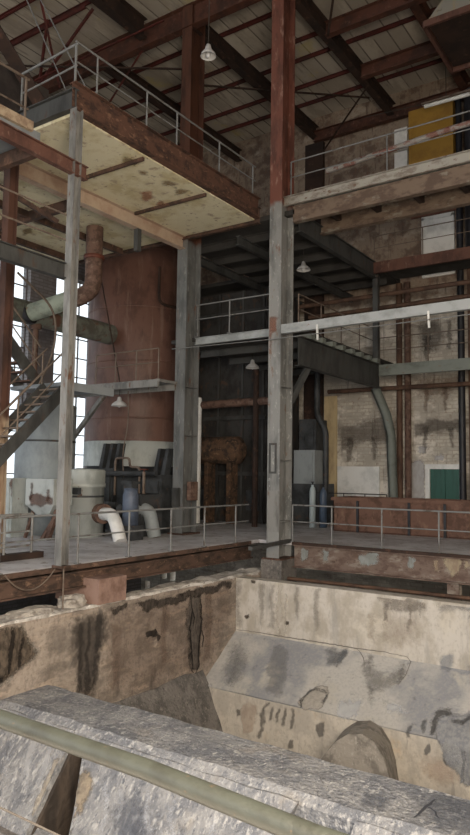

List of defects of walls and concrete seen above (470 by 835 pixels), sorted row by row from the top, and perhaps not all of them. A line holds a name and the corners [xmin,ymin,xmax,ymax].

peeling [359,553,378,565]
peeling [434,558,469,576]
damp [74,615,107,695]
peeling [298,685,328,710]
damp [258,703,294,738]
peeling [431,709,470,786]